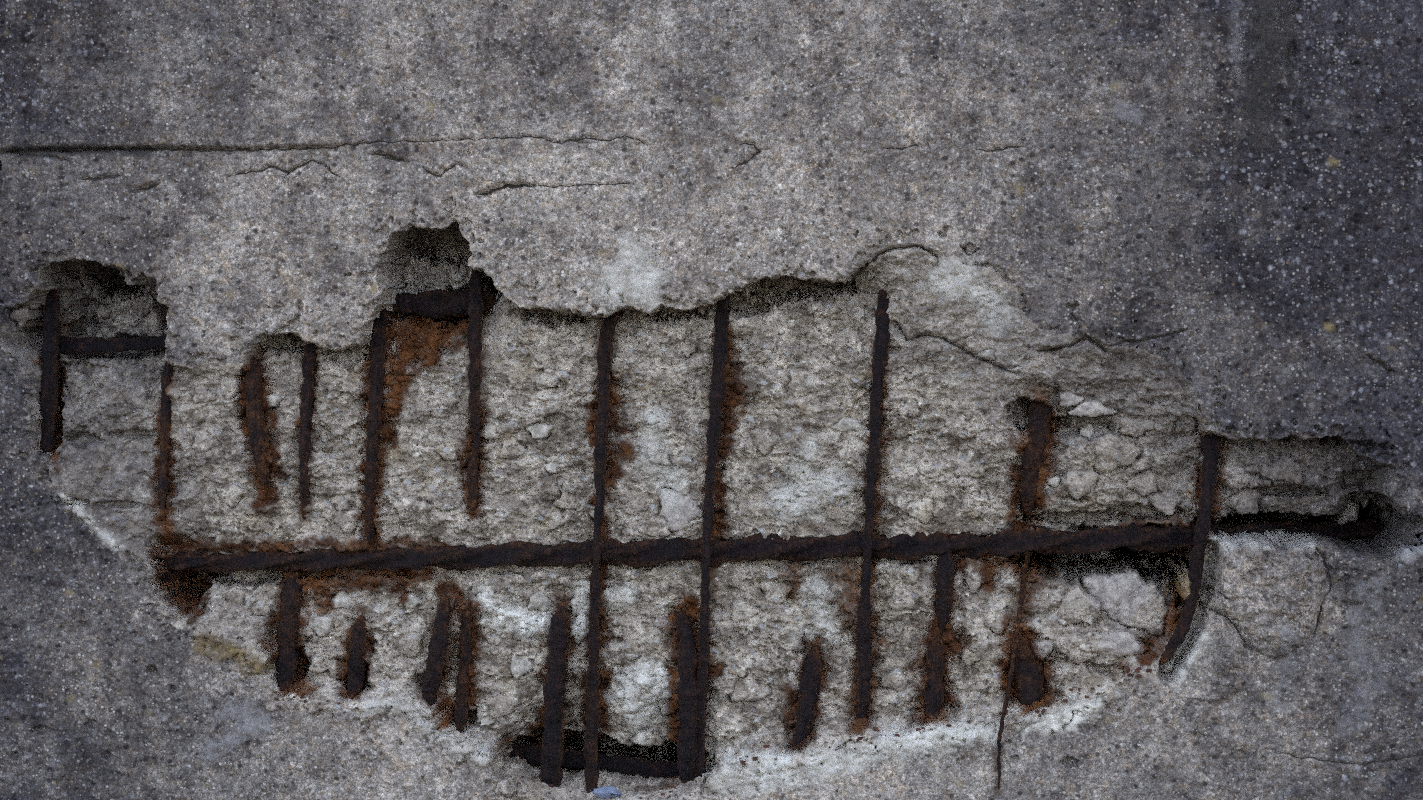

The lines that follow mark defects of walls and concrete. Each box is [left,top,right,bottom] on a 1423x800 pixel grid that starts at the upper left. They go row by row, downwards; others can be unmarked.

crack [0,135,647,195]
crack [733,143,760,168]
crack [847,245,938,284]
crack [895,323,1184,375]
spalling [0,221,1423,800]
rust [39,269,1385,793]